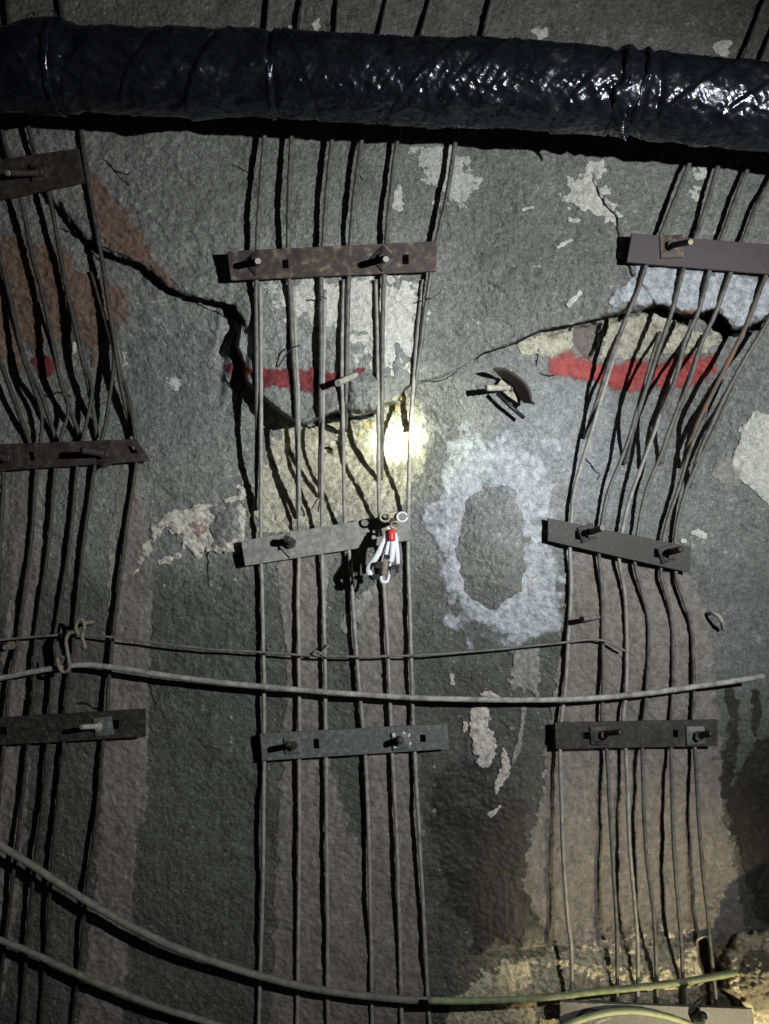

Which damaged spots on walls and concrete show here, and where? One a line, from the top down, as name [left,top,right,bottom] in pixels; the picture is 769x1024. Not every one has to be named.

rust [0,233,128,373]
rust [85,164,181,291]
crack [59,206,246,400]
crack [418,171,765,382]
spalling [247,392,430,534]
spalling [712,411,769,506]
peeling [462,691,511,818]
water stain [267,420,769,1024]